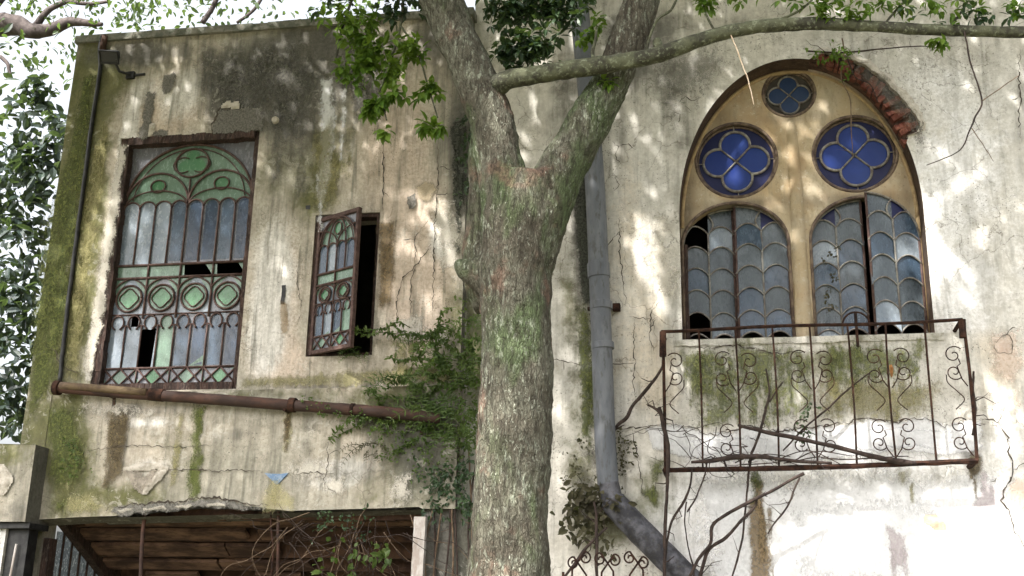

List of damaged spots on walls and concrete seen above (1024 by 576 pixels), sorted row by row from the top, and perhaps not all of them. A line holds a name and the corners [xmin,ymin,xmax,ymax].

flaking render [211,101,263,135]
damp [203,44,382,228]
flaking render [808,46,927,151]
crack [396,142,450,339]
crack [608,218,659,397]
damp [102,411,129,488]
flaking render [111,463,265,517]